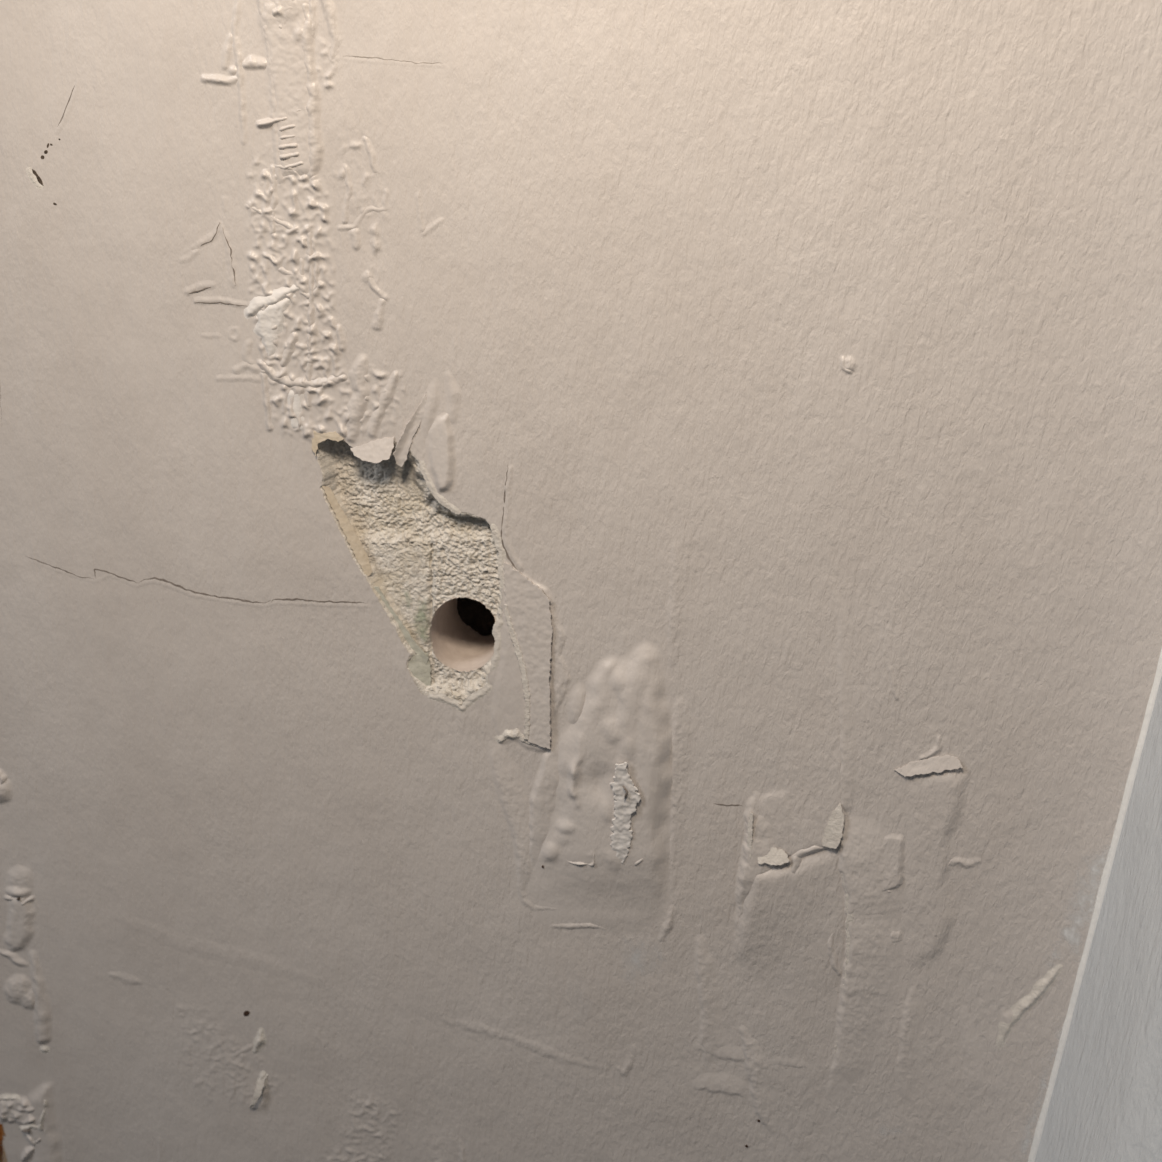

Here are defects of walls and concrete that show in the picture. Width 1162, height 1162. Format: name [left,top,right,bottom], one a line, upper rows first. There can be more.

peeling [244,284,299,356]
crack [26,556,373,609]
flaking render [287,390,506,713]